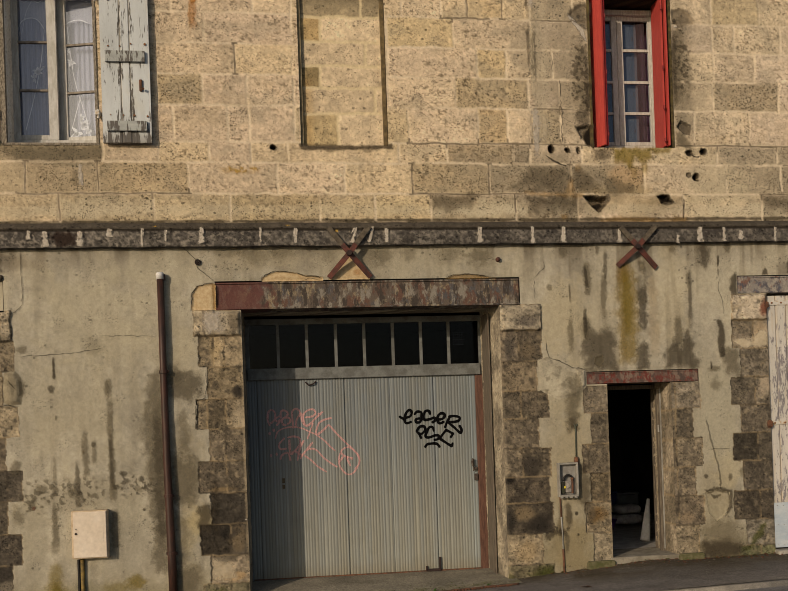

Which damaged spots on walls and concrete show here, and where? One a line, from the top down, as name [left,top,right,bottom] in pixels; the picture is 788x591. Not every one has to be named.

hole [583,195,610,212]
spalling [262,257,371,282]
spalling [191,283,216,311]
water stain [583,325,616,369]
water stain [669,339,697,367]
water stain [198,505,212,530]